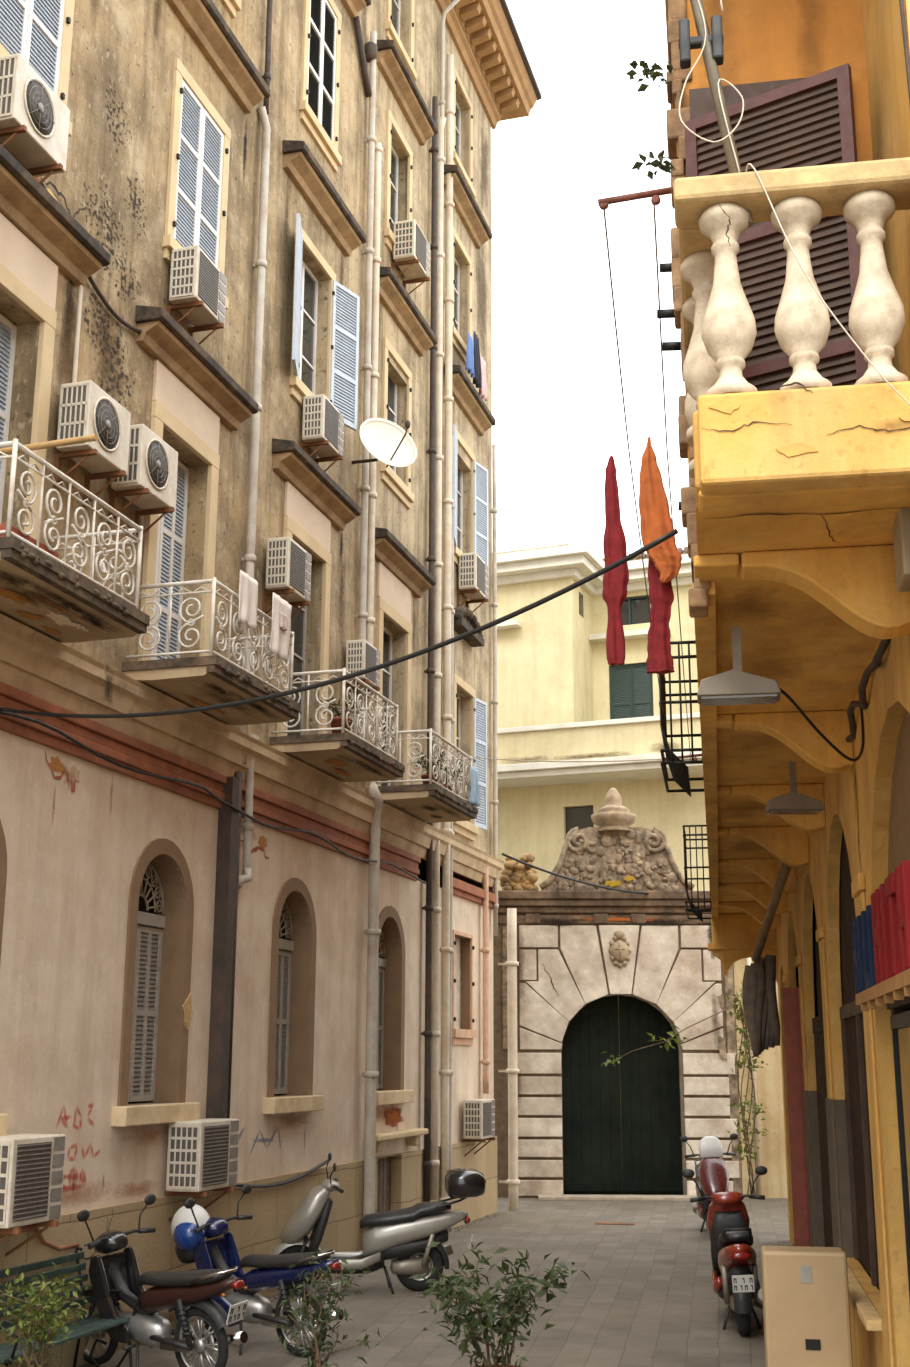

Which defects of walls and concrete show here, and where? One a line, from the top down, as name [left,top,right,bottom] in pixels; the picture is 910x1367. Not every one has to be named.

crack [769,382,813,393]
crack [702,421,792,432]
crack [828,425,910,435]
crack [715,507,907,542]